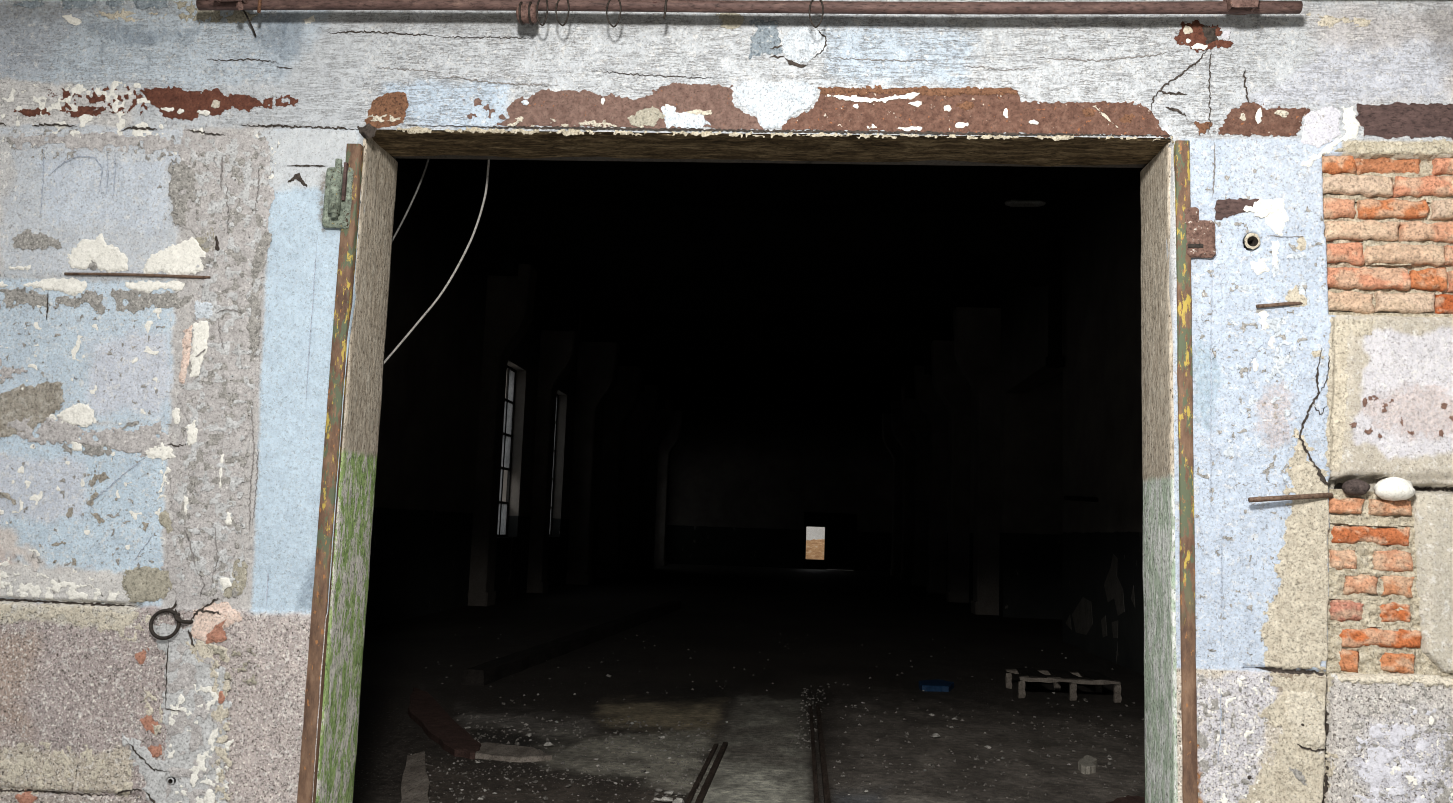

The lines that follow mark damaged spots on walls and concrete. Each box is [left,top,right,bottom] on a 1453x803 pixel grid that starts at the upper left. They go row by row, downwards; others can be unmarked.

peeling [357,80,1174,143]
crack [416,30,1249,193]
flaking render [0,80,307,670]
crack [1298,350,1330,489]
flaking render [1194,102,1453,803]